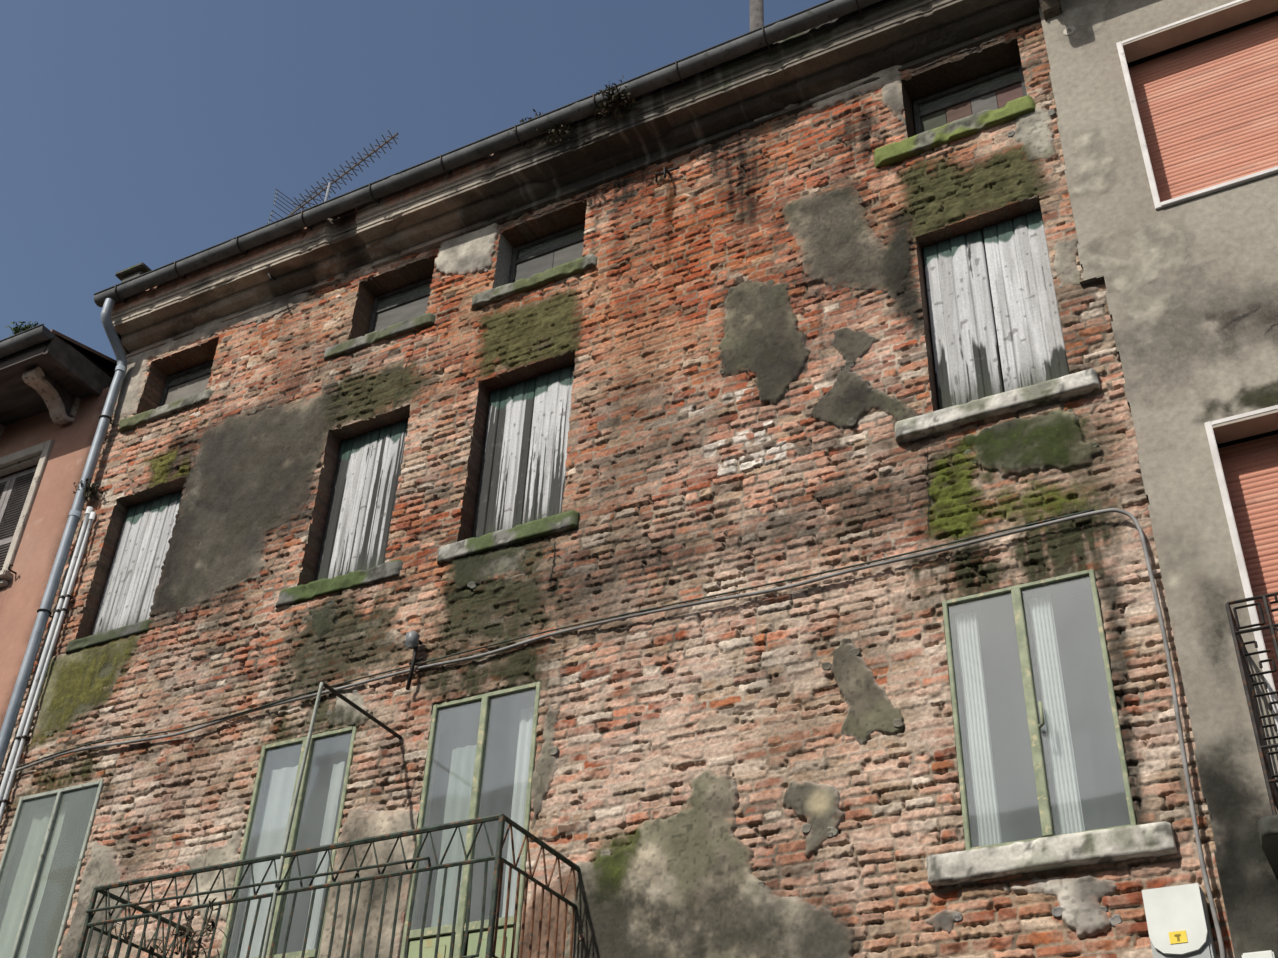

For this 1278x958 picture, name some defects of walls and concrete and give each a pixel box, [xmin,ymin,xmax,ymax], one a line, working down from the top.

flaking render [518,769,857,958]
flaking render [925,909,962,934]
flaking render [993,875,1130,939]